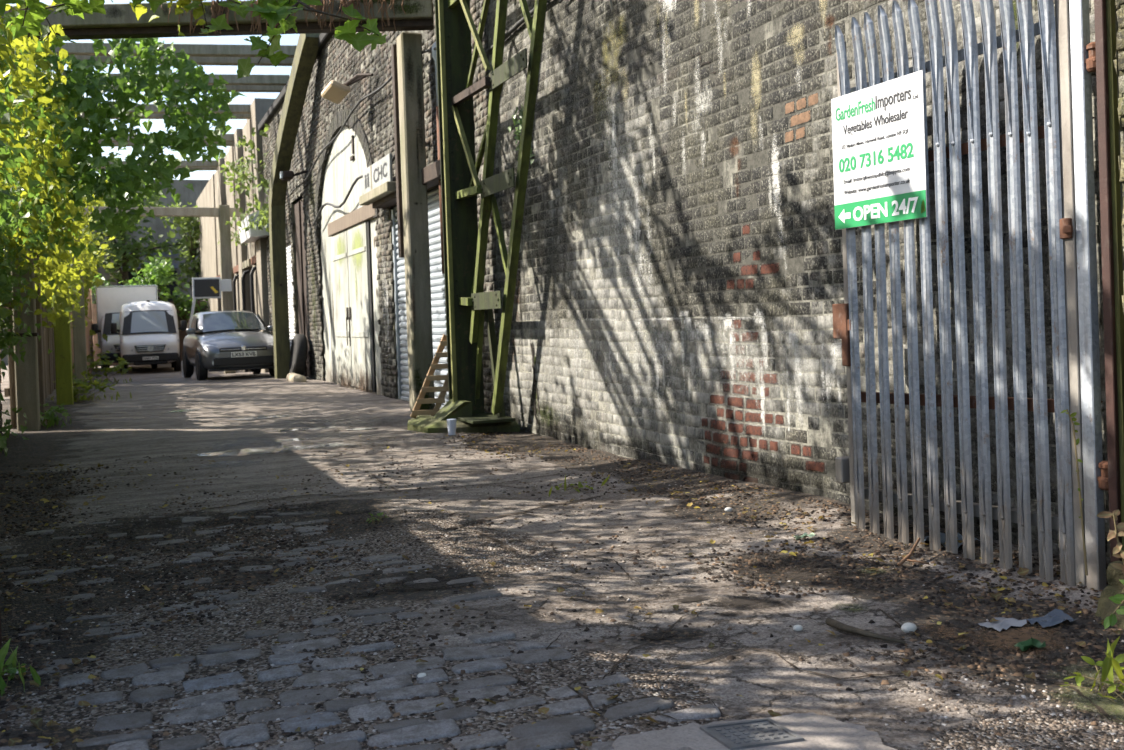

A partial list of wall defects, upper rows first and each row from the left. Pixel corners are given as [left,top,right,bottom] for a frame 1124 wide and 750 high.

water stain [659,0,676,91]
water stain [673,72,726,168]
water stain [752,62,761,100]
spalling [531,311,825,483]